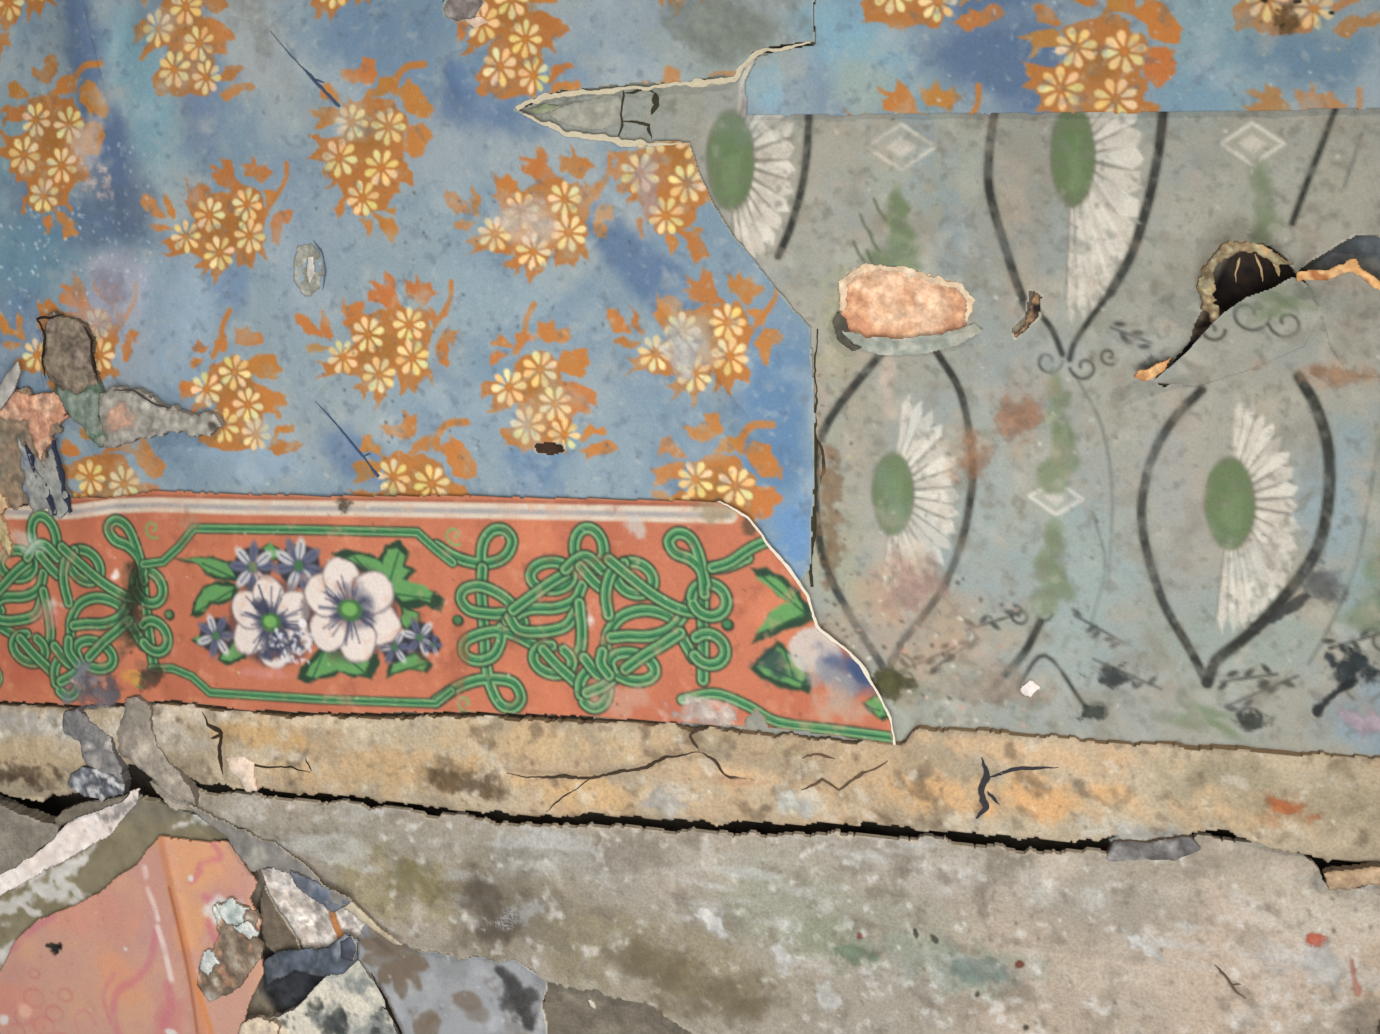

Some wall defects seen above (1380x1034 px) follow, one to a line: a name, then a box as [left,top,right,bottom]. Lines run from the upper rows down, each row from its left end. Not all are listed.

spalling [833,263,983,356]
peeling [1133,241,1380,387]
spalling [0,361,71,460]
peeling [98,385,226,448]
crack [202,712,312,774]
peeling [187,804,403,1034]
flaking render [543,982,690,1034]